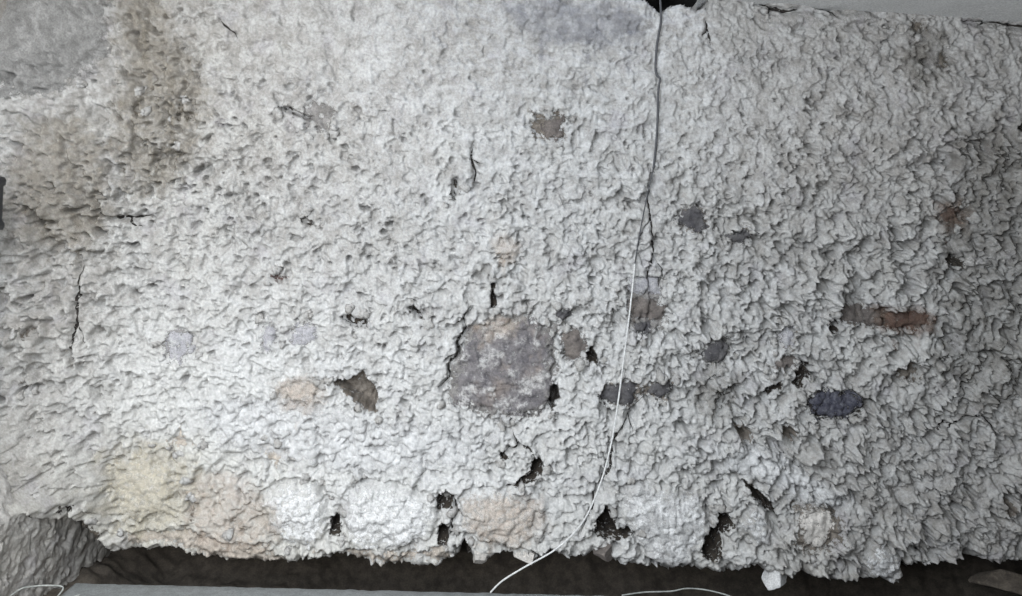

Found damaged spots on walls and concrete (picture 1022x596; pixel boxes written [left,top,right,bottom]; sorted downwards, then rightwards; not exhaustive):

crack [470,149,480,181]
spalling [527,107,578,151]
crack [635,168,663,349]
crack [69,261,85,360]
spalling [269,369,383,424]
crack [441,308,472,386]
spalling [437,282,607,432]
crack [580,396,643,533]
spalling [733,415,761,443]
spalling [763,315,868,442]
hole [592,505,647,541]
hole [701,504,736,562]